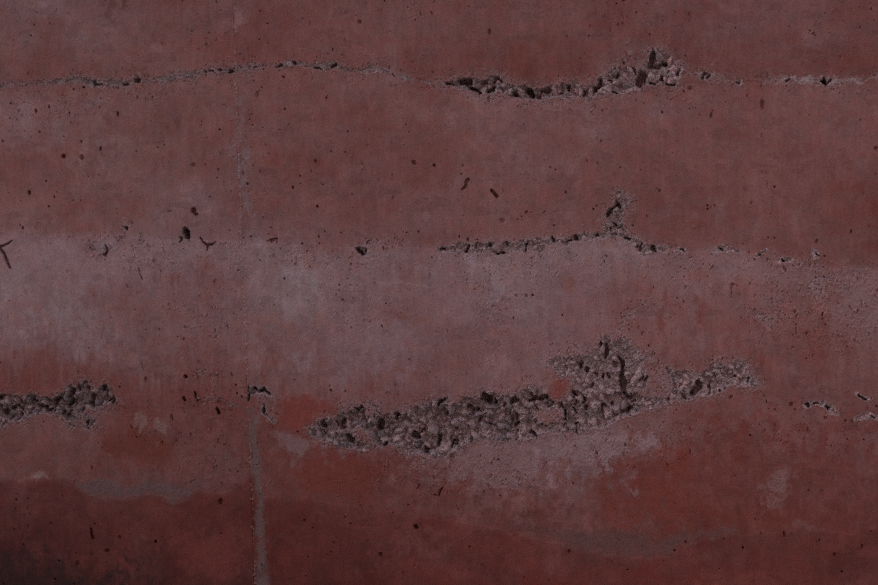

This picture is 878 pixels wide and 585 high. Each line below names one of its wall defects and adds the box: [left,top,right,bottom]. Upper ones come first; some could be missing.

spalling [442,47,684,101]
spalling [0,379,116,430]
spalling [270,294,759,498]